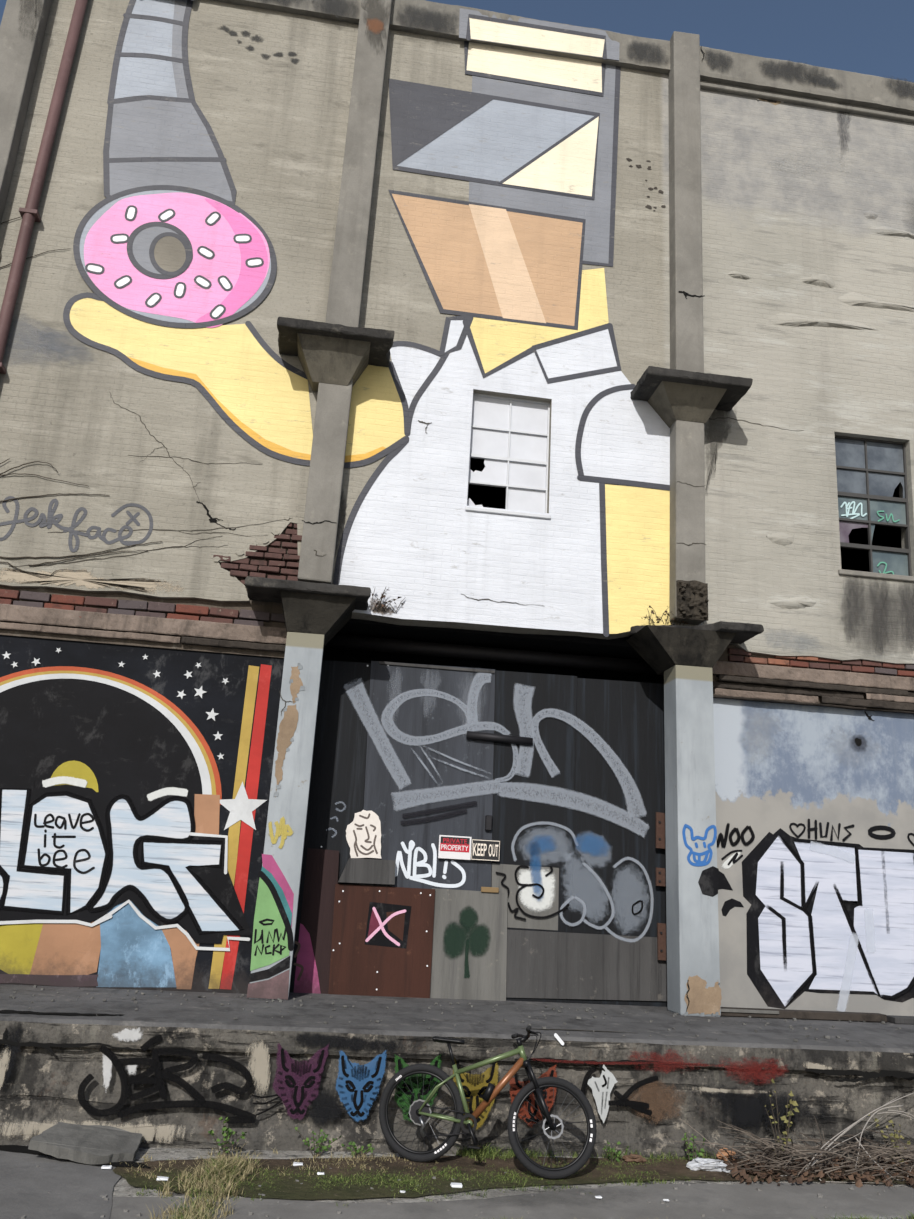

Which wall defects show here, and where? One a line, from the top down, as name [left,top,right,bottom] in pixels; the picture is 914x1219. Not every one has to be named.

damp [763,61,839,88]
crack [678,291,705,299]
damp [707,410,729,485]
crack [9,393,336,567]
flaking render [212,515,302,591]
crack [463,594,543,606]
spalling [676,580,709,621]
damp [847,587,914,648]
peeling [273,663,305,798]
peeling [684,975,722,1016]